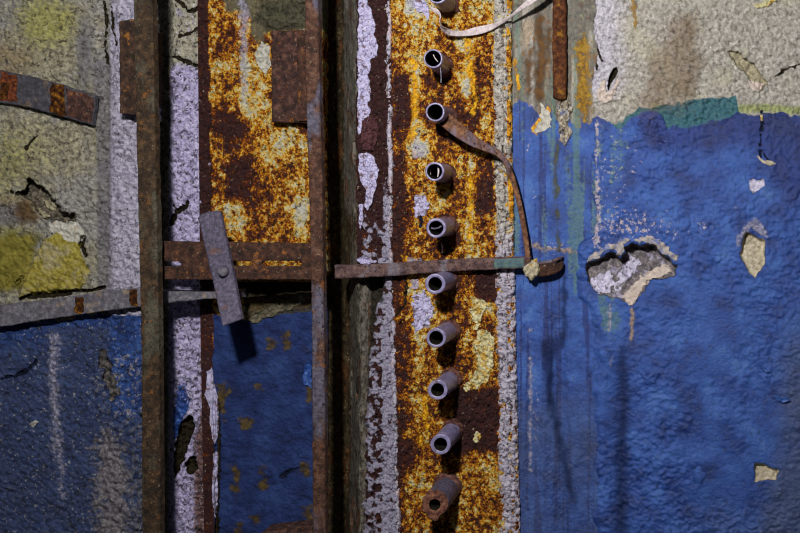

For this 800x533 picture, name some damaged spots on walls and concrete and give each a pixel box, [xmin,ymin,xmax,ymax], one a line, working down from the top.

crack [103,0,118,64]
corrosion [198,0,311,243]
corrosion [321,0,329,280]
corrosion [408,58,419,142]
corrosion [464,38,478,115]
flaking render [597,78,620,104]
crack [775,63,800,76]
flaking render [18,178,90,298]
spalling [586,235,679,306]
flaking render [740,232,765,278]
corrosion [200,279,313,533]
flaking render [754,463,779,482]